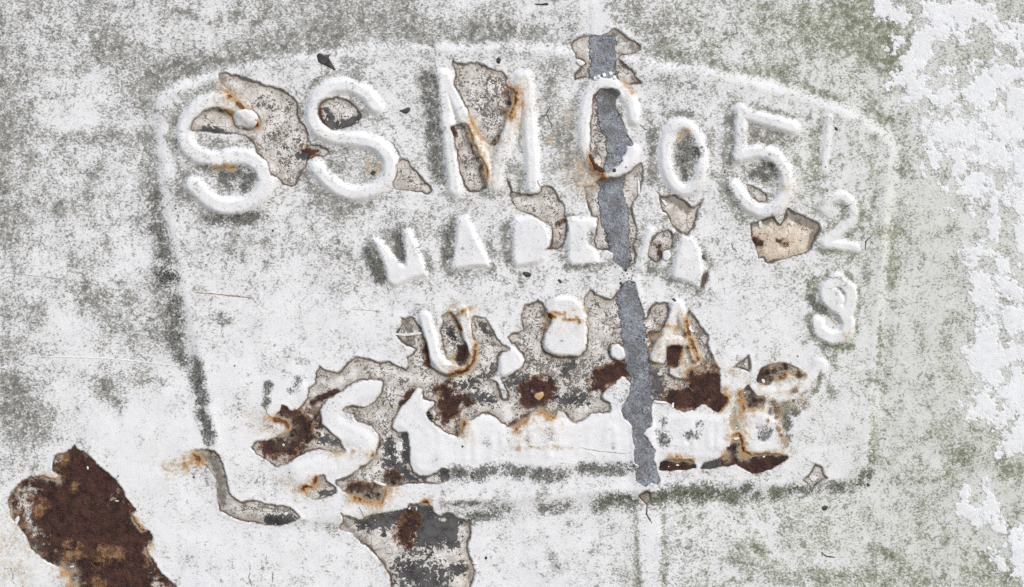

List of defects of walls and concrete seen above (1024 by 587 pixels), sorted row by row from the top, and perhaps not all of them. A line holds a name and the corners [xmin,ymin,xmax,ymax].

peeling [571,29,641,85]
peeling [191,73,329,187]
peeling [451,57,513,192]
peeling [750,209,820,263]
peeling [196,450,300,526]
corrosion [260,413,292,436]
peeling [252,94,702,587]
corrosion [512,407,558,451]
peeling [640,298,727,413]
peeling [659,437,788,474]
corrosion [720,362,807,460]
peeling [735,356,798,409]